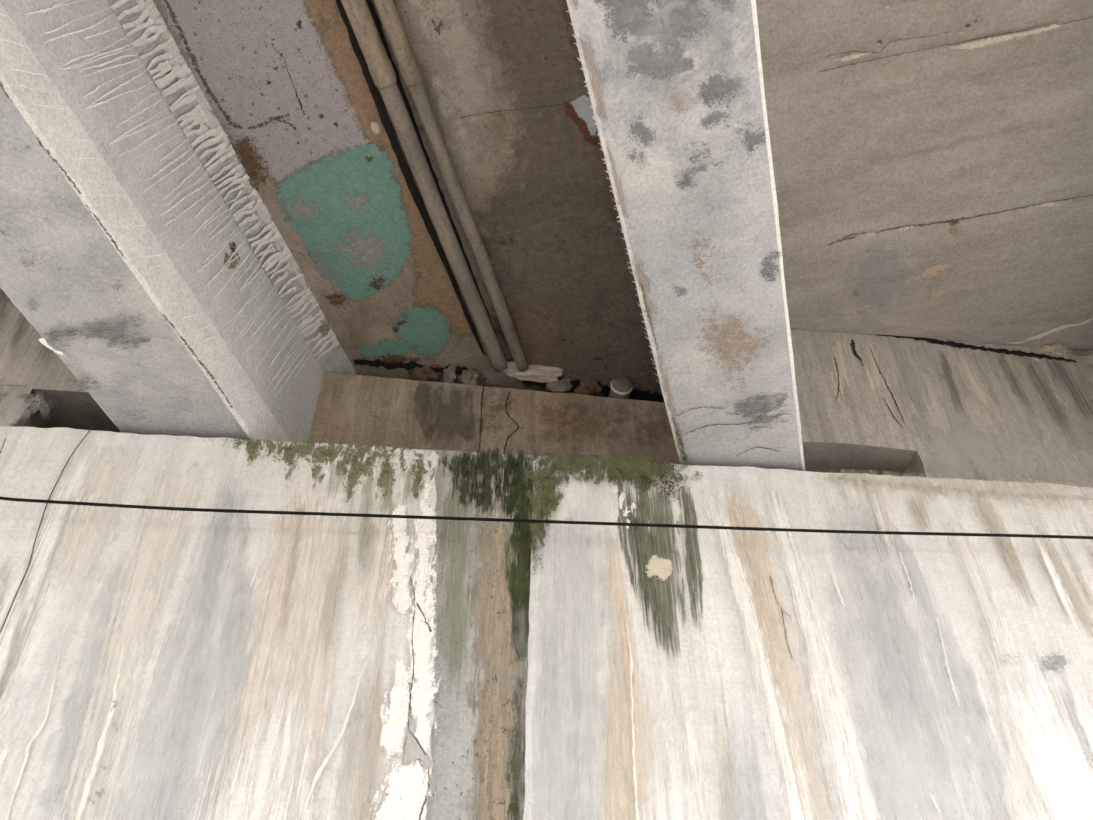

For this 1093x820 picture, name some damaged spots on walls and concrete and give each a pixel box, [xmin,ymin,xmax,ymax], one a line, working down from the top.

crack [819,16,1093,72]
crack [824,195,1093,247]
crack [478,378,524,454]
crack [834,339,905,426]
leakage [942,353,962,407]
leakage [62,384,817,820]
peeling [369,479,440,820]
leakage [767,485,952,820]
leakage [951,526,1041,820]
leakage [1042,650,1068,673]